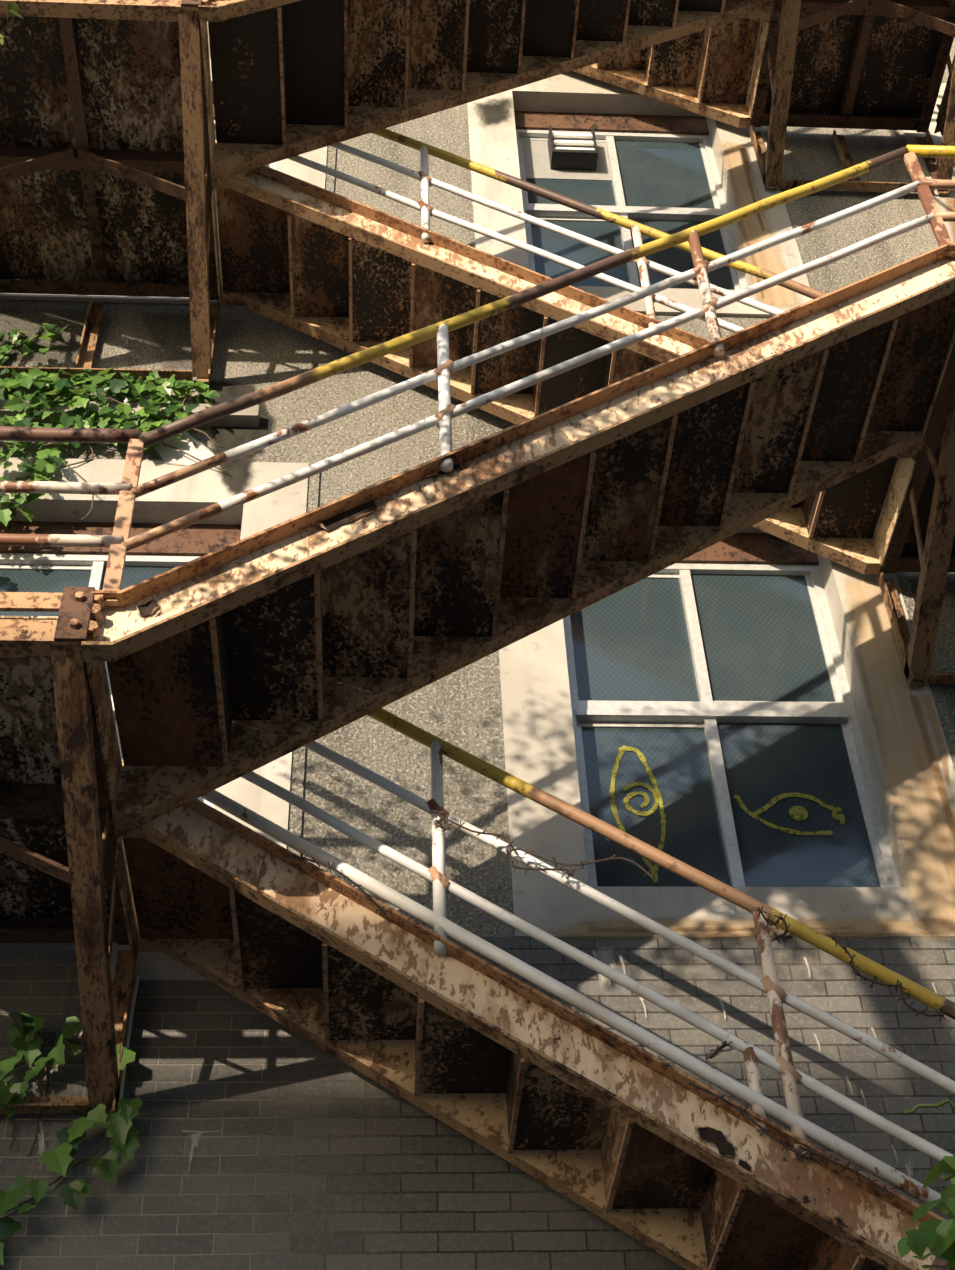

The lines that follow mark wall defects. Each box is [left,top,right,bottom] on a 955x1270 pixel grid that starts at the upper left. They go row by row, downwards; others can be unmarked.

corrosion [555,579,955,938]